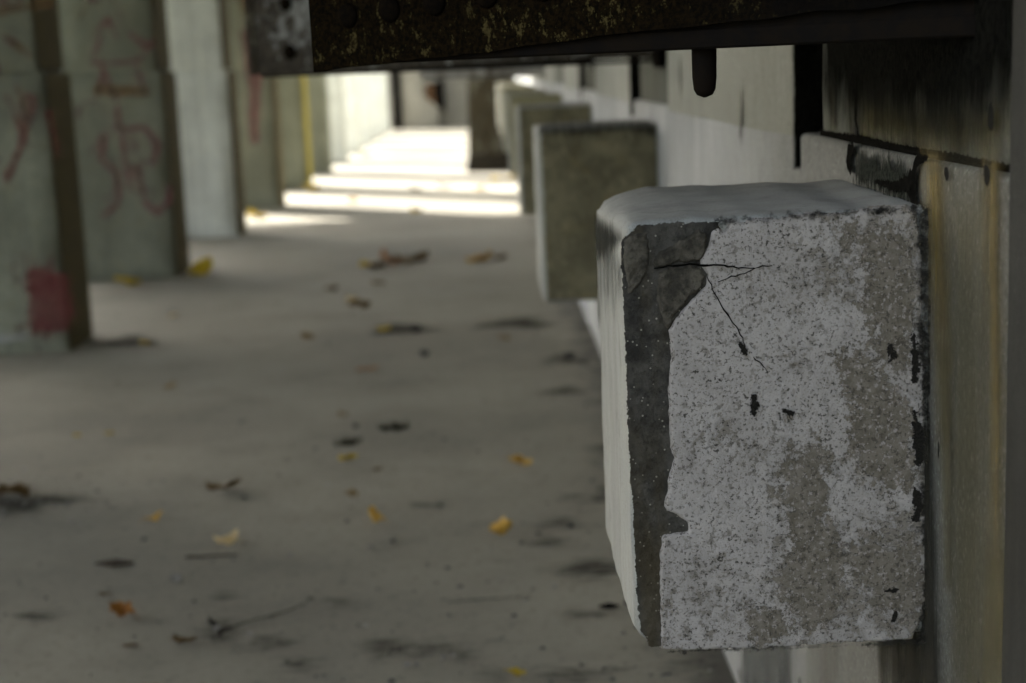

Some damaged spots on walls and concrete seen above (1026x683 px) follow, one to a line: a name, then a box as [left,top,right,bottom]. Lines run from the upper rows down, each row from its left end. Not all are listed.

spalling [620,221,720,647]
crack [654,263,772,373]
corrosion [927,164,945,383]
water stain [861,437,934,683]